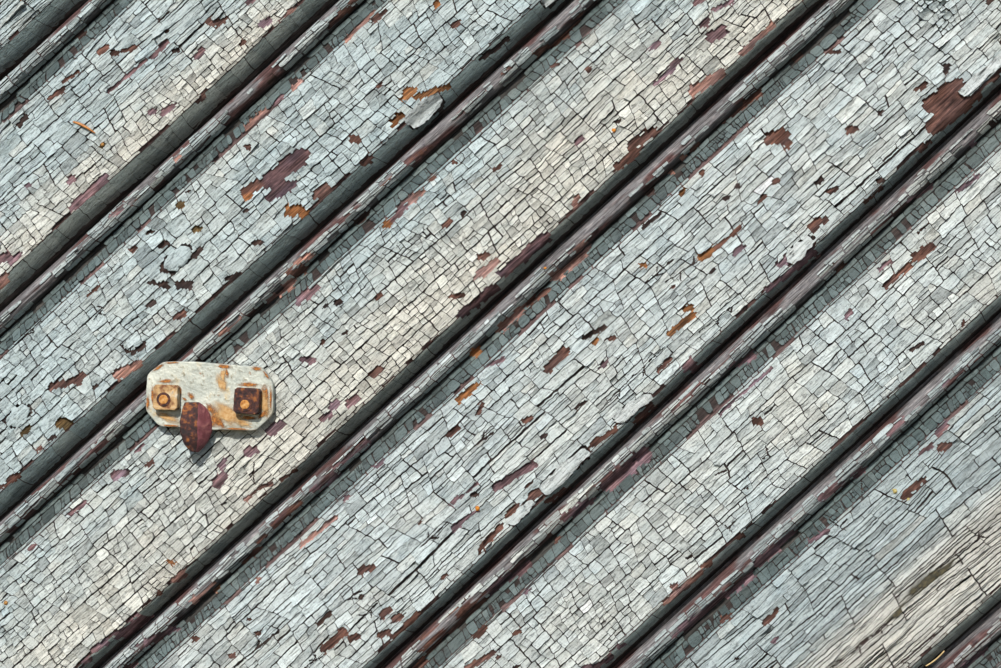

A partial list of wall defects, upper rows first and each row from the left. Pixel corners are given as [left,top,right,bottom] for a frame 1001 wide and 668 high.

peeling [904,39,1001,153]
peeling [747,118,801,156]
peeling [234,137,334,219]
crack [643,256,699,287]
peeling [534,323,619,374]
peeling [20,365,100,454]
corrosion [146,379,194,408]
corrosion [207,365,272,430]
crack [929,525,993,574]
crack [340,586,380,630]
crack [233,626,281,668]
crack [830,611,900,668]